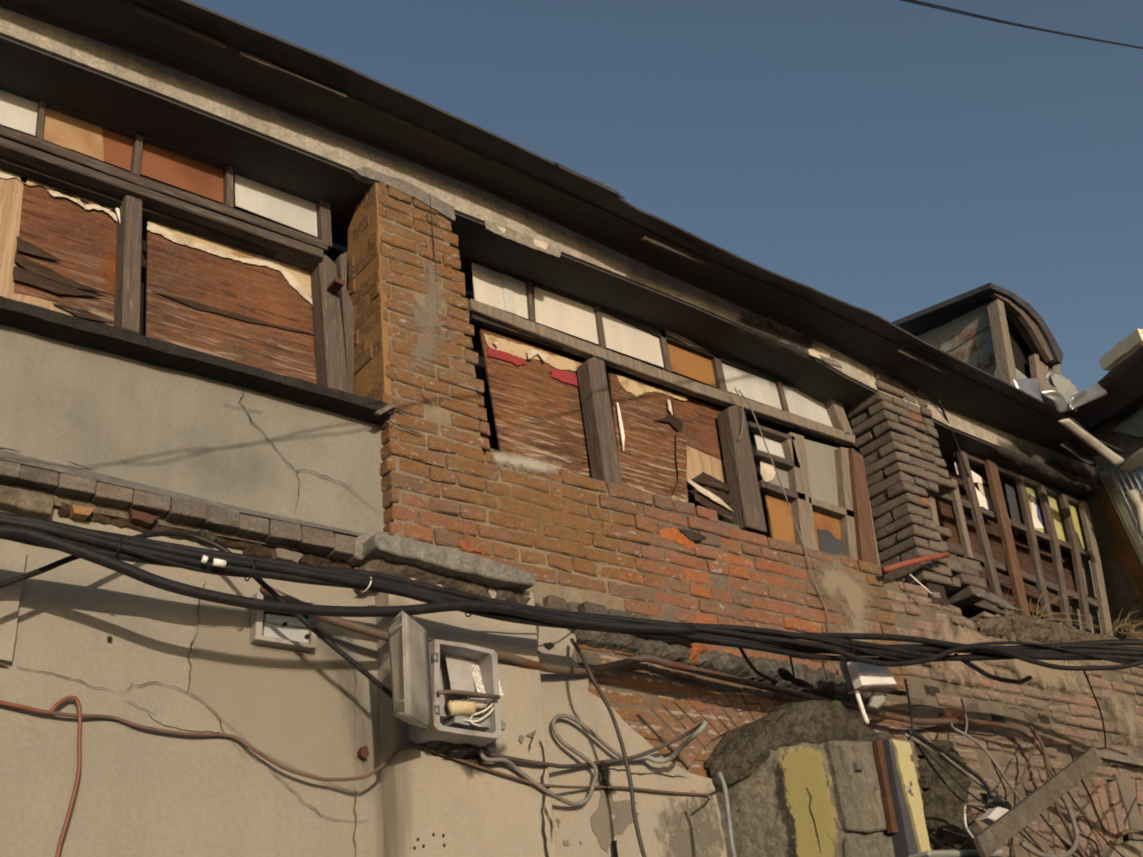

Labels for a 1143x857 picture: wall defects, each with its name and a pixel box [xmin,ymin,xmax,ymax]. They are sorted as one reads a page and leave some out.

crack [225,387,369,513]
crack [0,582,367,857]
spalling [567,629,1143,857]
spalling [885,578,1017,646]